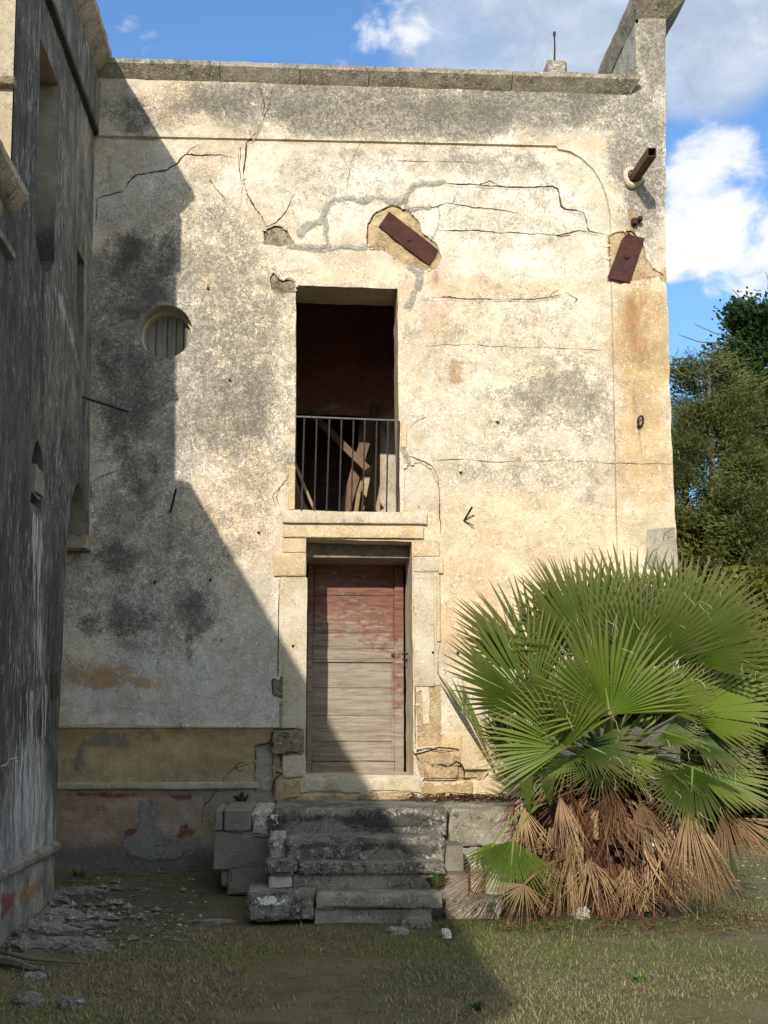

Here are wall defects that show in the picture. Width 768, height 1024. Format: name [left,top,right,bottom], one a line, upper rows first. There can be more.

crack [96,88,295,227]
spalling [261,225,294,246]
spalling [270,272,298,294]
spalling [366,204,441,271]
crack [398,160,614,242]
spalling [607,229,667,285]
leakage [96,339,161,496]
leakage [78,588,222,659]